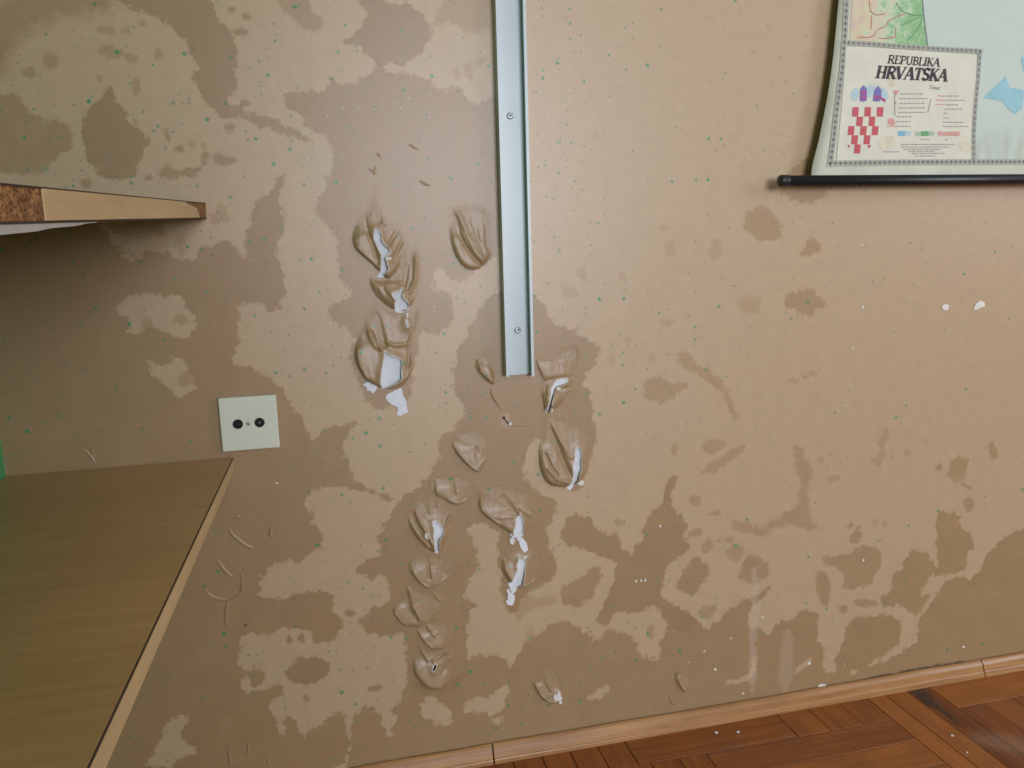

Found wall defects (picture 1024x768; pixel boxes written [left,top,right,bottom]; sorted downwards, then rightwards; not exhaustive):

leakage [82,87,235,186]
leakage [120,0,366,148]
leakage [319,0,499,324]
leakage [0,176,1024,768]